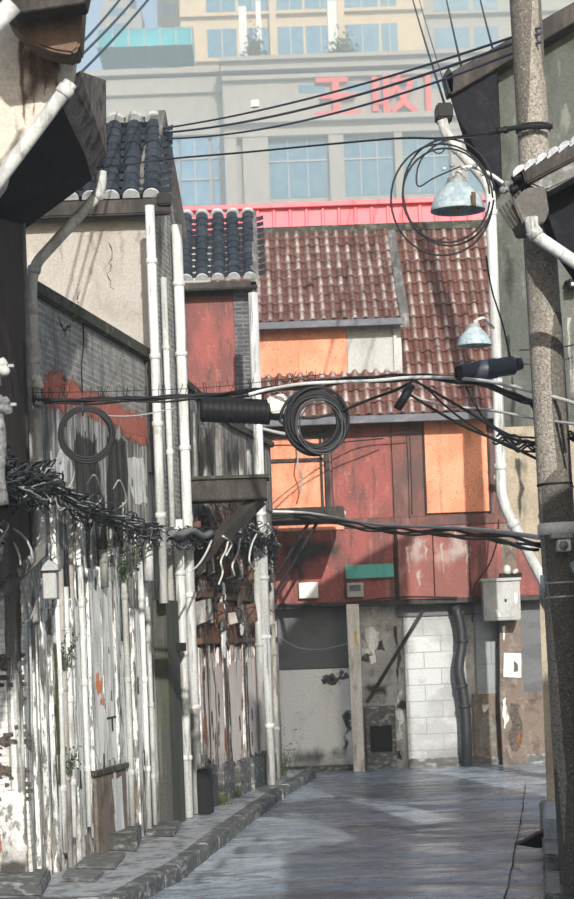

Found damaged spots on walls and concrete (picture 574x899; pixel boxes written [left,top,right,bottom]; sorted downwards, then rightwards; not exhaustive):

damp [19,40,60,118]
peeling [43,371,148,505]
spalling [195,503,240,531]
peeling [406,540,428,565]
peeling [440,532,469,560]
spalling [197,541,255,767]
peeling [361,626,385,664]
crack [503,783,532,899]